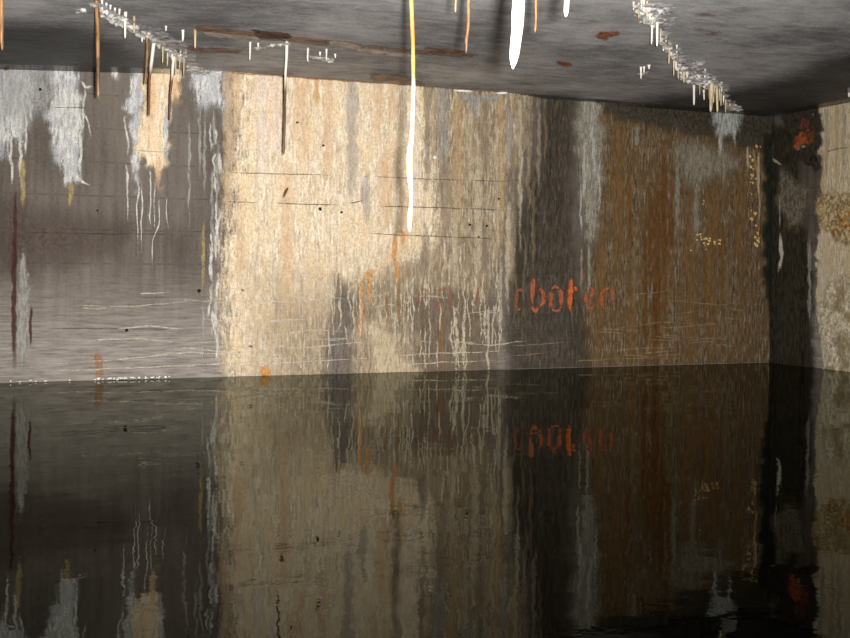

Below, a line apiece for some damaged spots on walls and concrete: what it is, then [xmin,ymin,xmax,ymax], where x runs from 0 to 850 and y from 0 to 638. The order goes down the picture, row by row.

crack [74,3,210,75]
rust [162,25,474,59]
rust [241,73,450,89]
rust [595,31,620,41]
crack [633,3,742,112]
rust [392,230,405,281]
water stain [0,27,850,377]
rust [522,94,769,367]
rust [359,270,374,330]